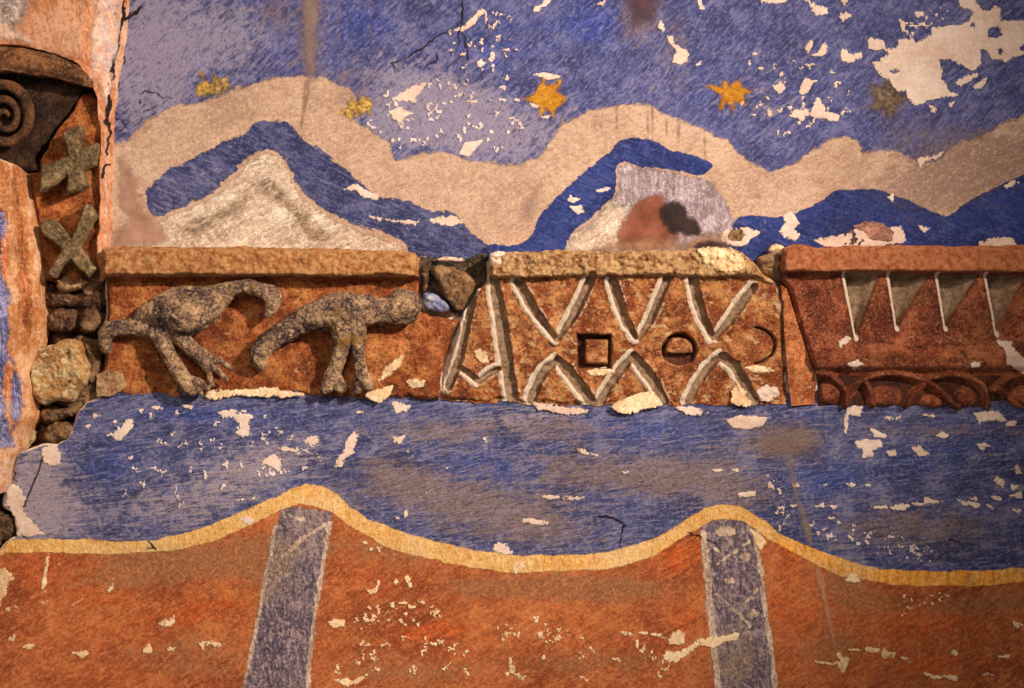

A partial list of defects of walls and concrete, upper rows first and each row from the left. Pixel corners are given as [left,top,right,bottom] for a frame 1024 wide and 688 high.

crack [101,0,171,178]
crack [391,0,469,70]
peeling [367,8,518,156]
peeling [841,0,1024,113]
peeling [107,405,193,441]
peeling [156,387,321,478]
peeling [334,431,359,468]
peeling [843,405,896,458]
peeling [973,410,1017,426]
crack [594,515,627,551]
peeling [327,580,469,687]
peeling [621,629,740,678]